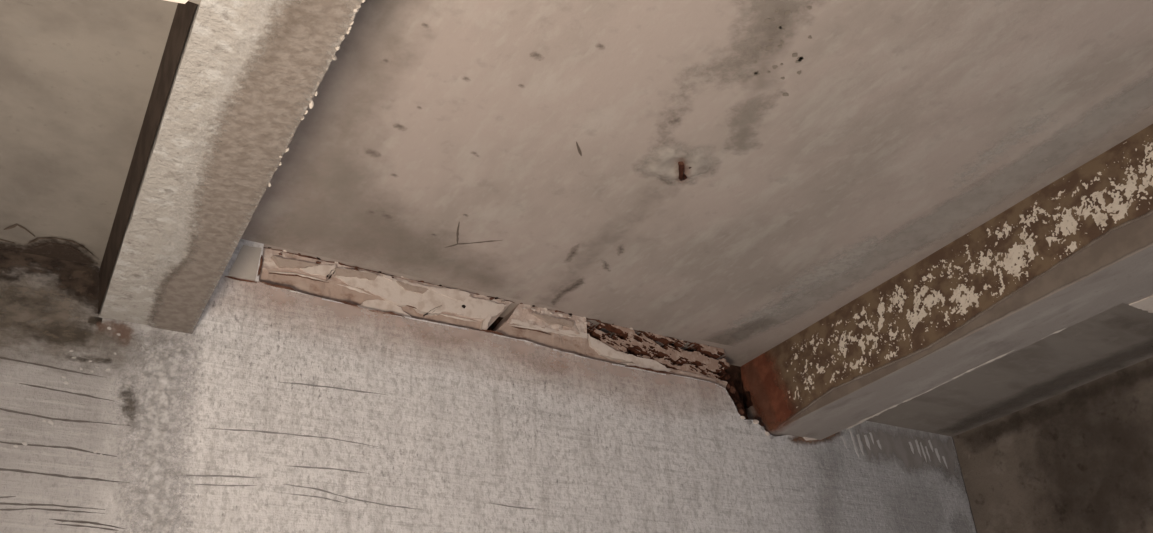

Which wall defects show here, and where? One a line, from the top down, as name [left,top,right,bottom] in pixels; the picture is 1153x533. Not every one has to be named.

leakage [0,1,197,362]
spalling [259,0,365,197]
leakage [754,10,803,96]
peeling [257,124,1153,439]
corrosion [741,351,794,431]
spalling [792,432,839,444]
leakage [841,343,1153,533]